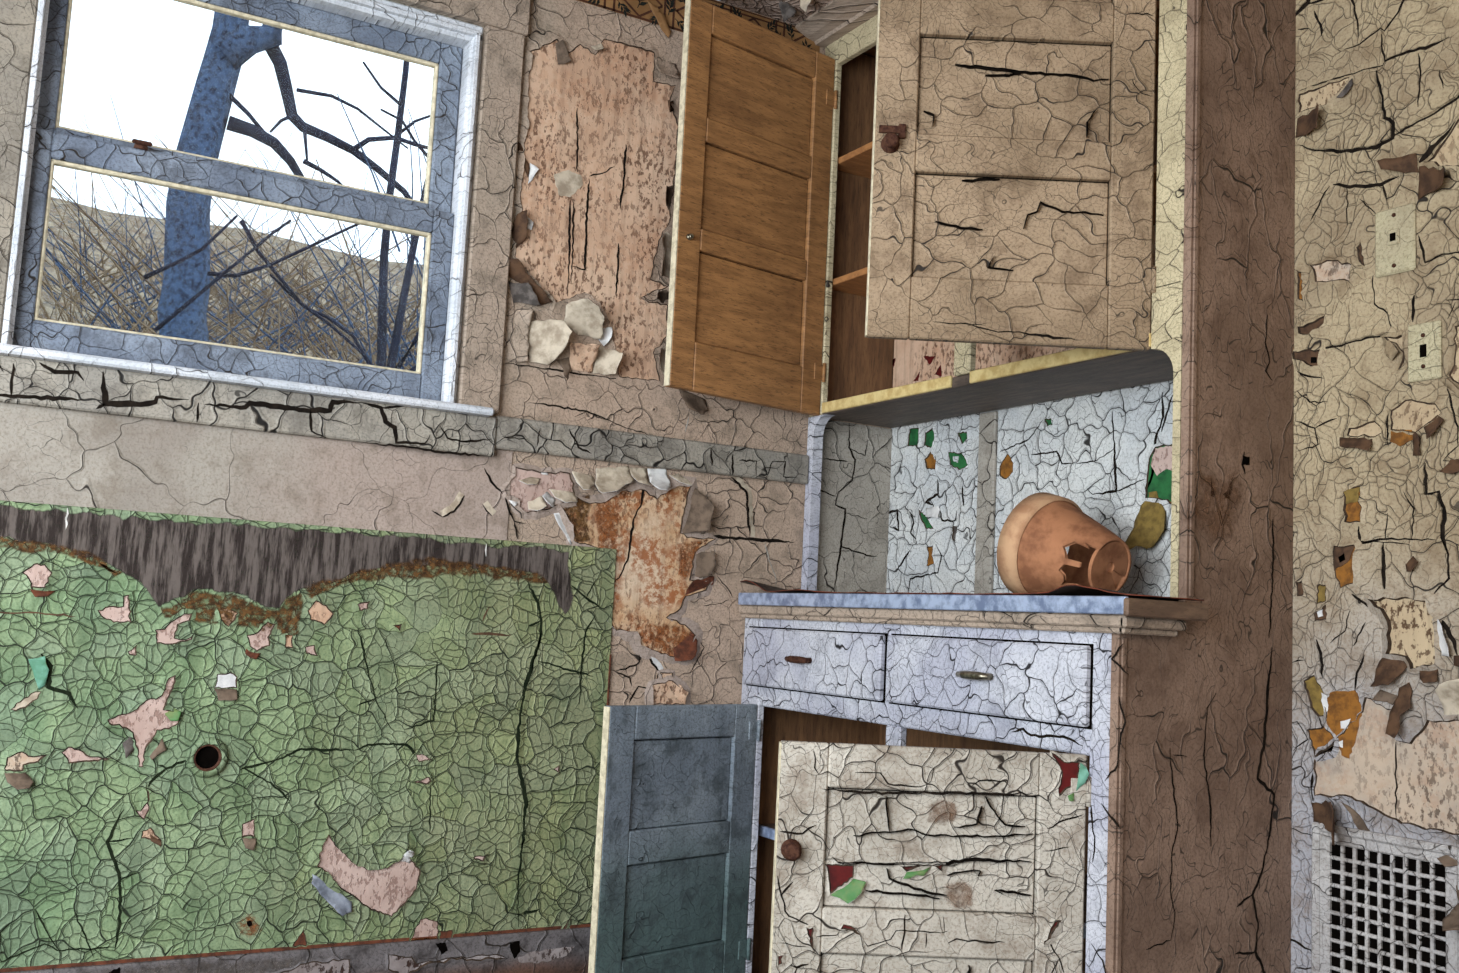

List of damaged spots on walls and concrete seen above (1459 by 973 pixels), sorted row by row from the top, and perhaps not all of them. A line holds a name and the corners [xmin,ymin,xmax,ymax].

peeling [507,0,708,414]
crack [1295,0,1459,226]
peeling [15,557,60,597]
crack [41,654,78,709]
crack [0,760,186,962]
peeling [0,589,374,851]
crack [0,362,648,539]
crack [471,580,705,927]
peeling [499,463,718,705]
crack [685,417,964,589]
peeling [1293,482,1459,867]
peeling [1339,322,1459,456]